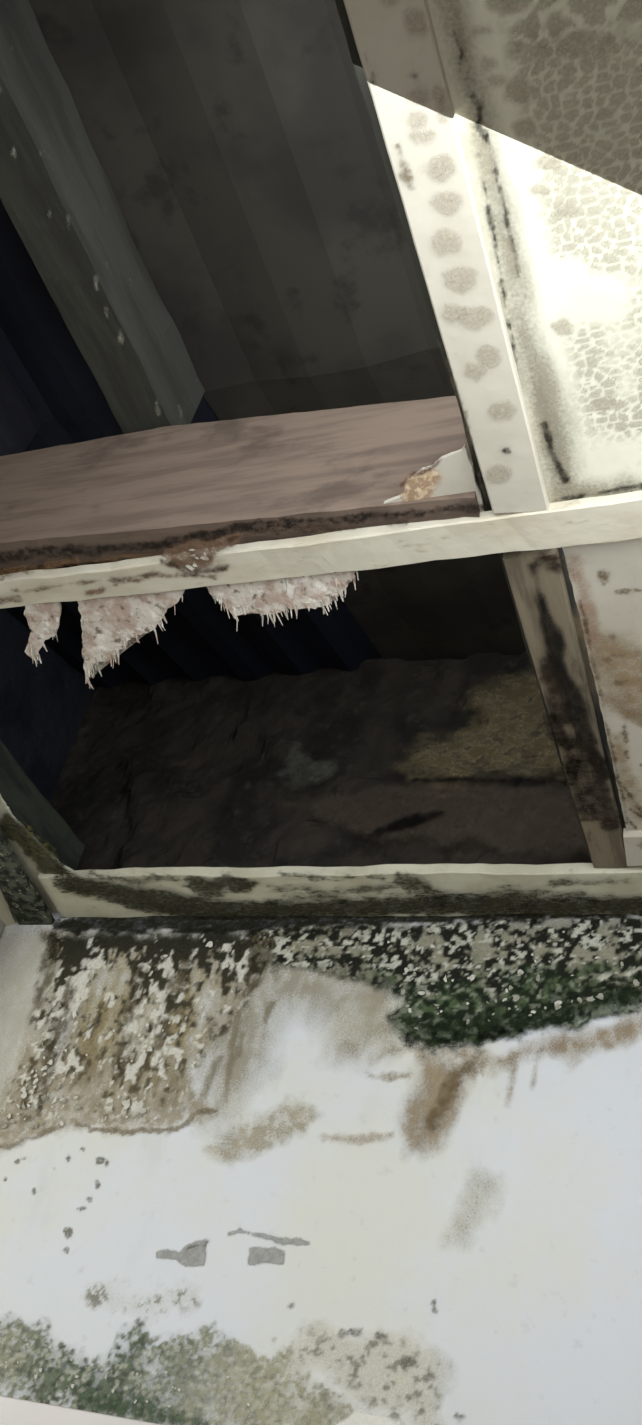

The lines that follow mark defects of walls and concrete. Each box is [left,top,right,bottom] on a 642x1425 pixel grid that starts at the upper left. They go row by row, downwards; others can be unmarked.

leakage [442,0,527,297]
leakage [509,310,633,502]
leakage [528,551,642,831]
leakage [0,814,642,1148]
peeling [0,1048,216,1149]
leakage [217,1109,312,1159]
leakage [86,1286,107,1307]
peeling [156,1239,208,1267]
peeling [248,1247,285,1265]
leakage [0,1319,440,1425]